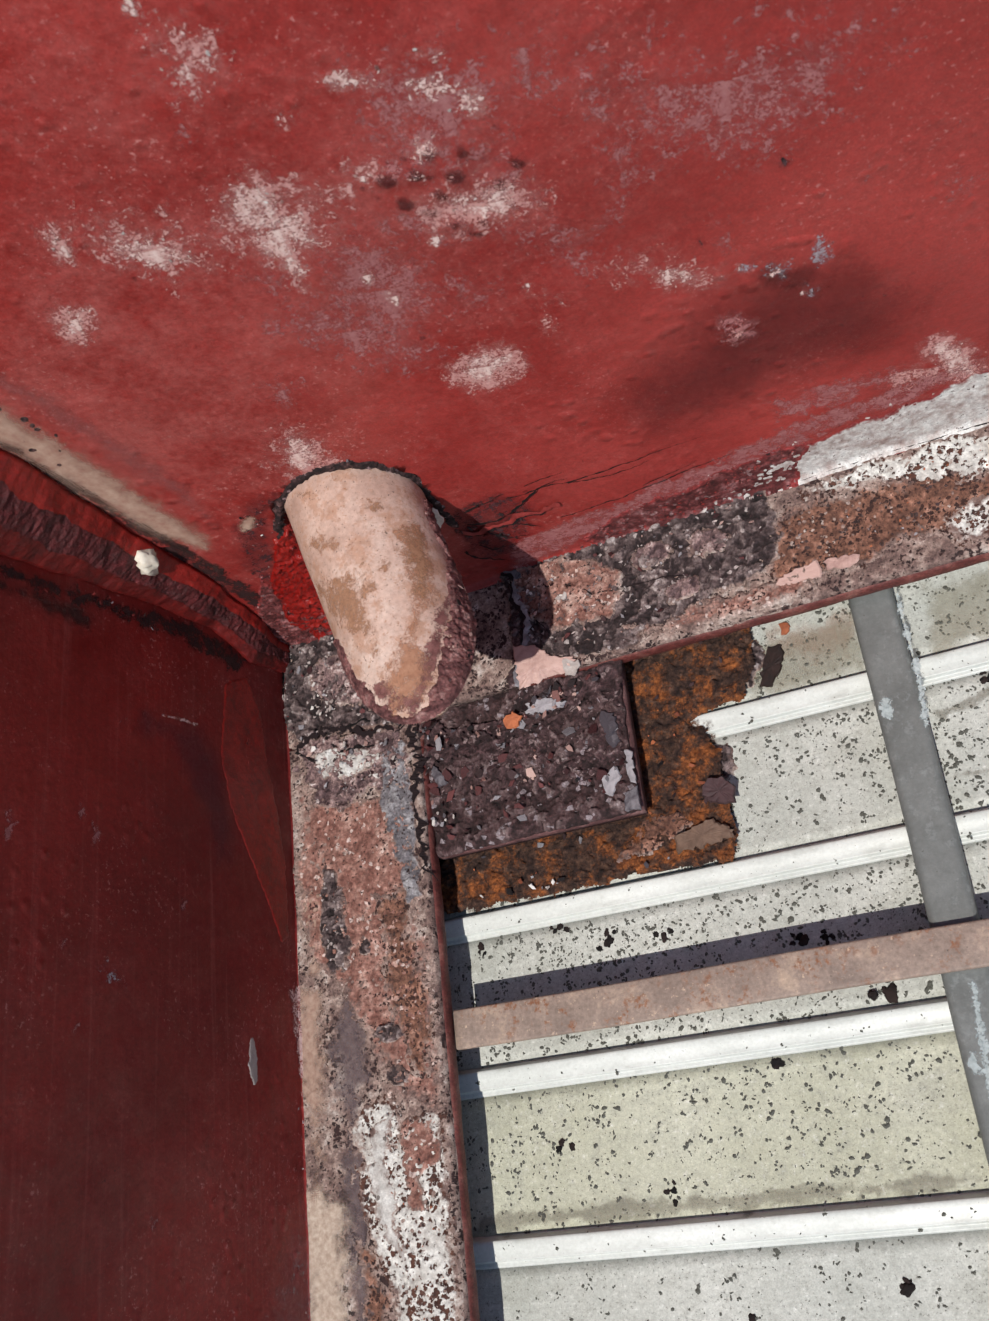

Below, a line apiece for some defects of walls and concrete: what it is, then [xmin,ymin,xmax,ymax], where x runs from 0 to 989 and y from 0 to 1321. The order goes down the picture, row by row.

mould [0,562,247,673]
damp [0,408,261,612]
peeling [432,331,989,569]
crack [266,637,438,881]
corrosion [254,468,989,1212]
corrosion [306,1191,397,1321]